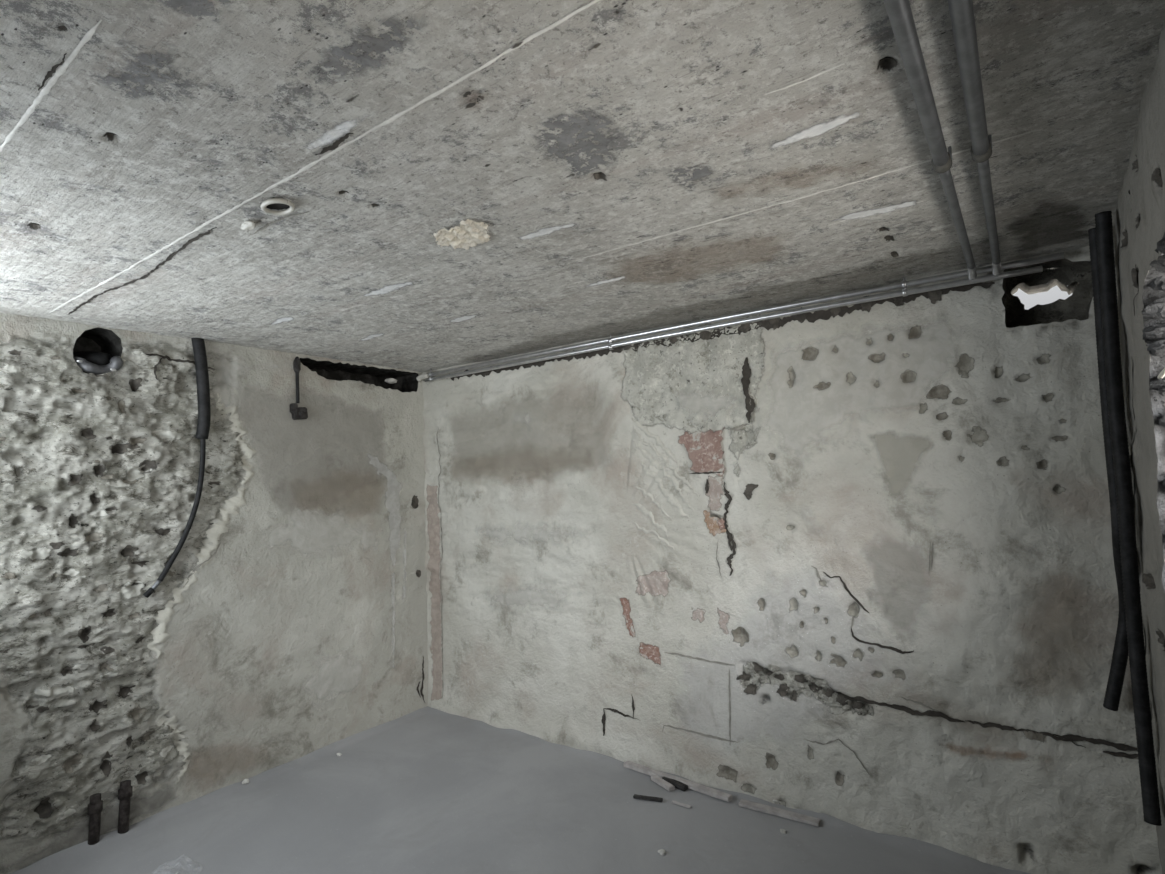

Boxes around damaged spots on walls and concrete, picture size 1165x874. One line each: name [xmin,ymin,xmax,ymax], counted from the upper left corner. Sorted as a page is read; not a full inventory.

leakage [159,0,230,20]
leakage [537,111,613,175]
crack [68,227,217,315]
spalling [1131,232,1165,357]
spalling [787,347,838,388]
spalling [919,384,967,441]
crack [705,479,736,576]
flaking render [0,338,256,839]
flaking render [620,570,671,665]
crack [812,566,914,654]
crack [805,739,870,775]
crack [831,688,1138,759]